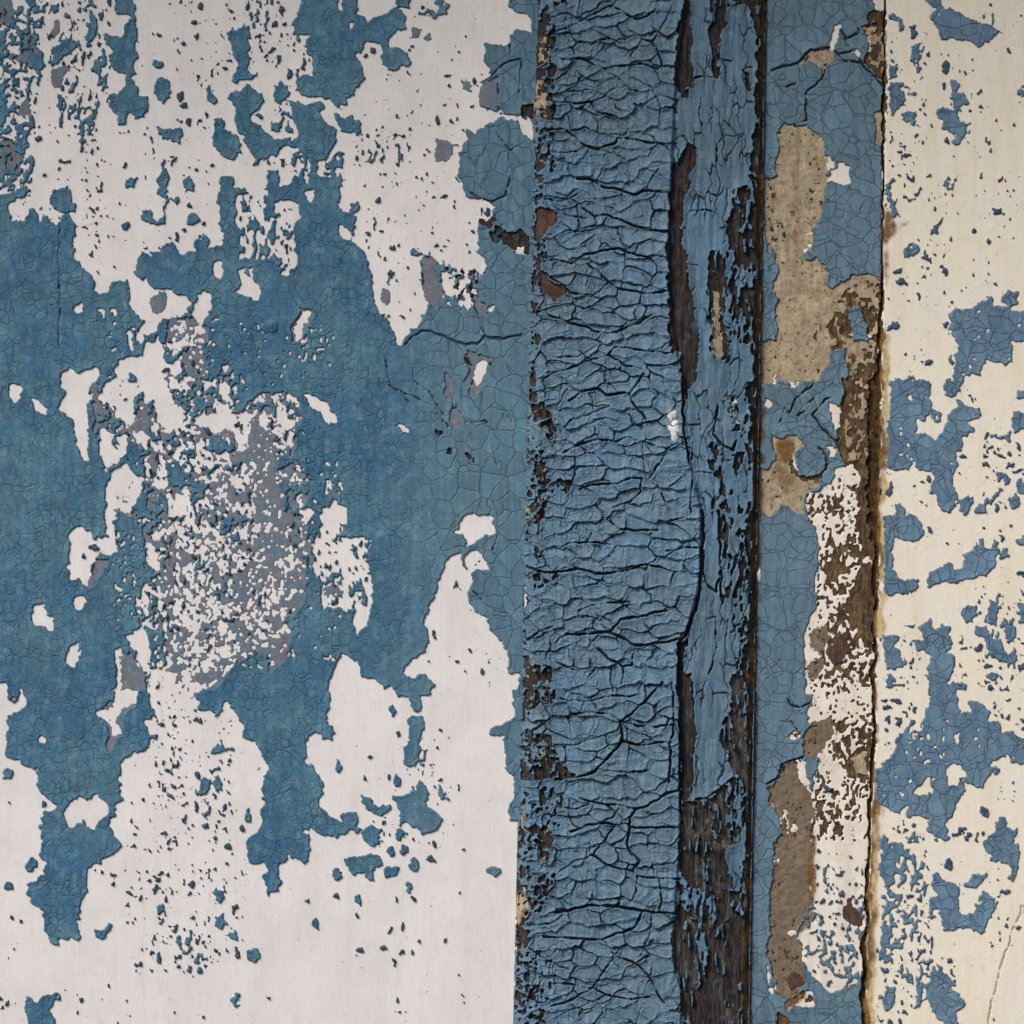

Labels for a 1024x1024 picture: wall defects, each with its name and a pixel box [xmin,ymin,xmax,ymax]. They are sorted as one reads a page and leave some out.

peeling [0,0,551,1024]
crack [525,6,730,1006]
peeling [682,919,701,1007]
peeling [682,799,735,975]
peeling [724,0,1024,1024]